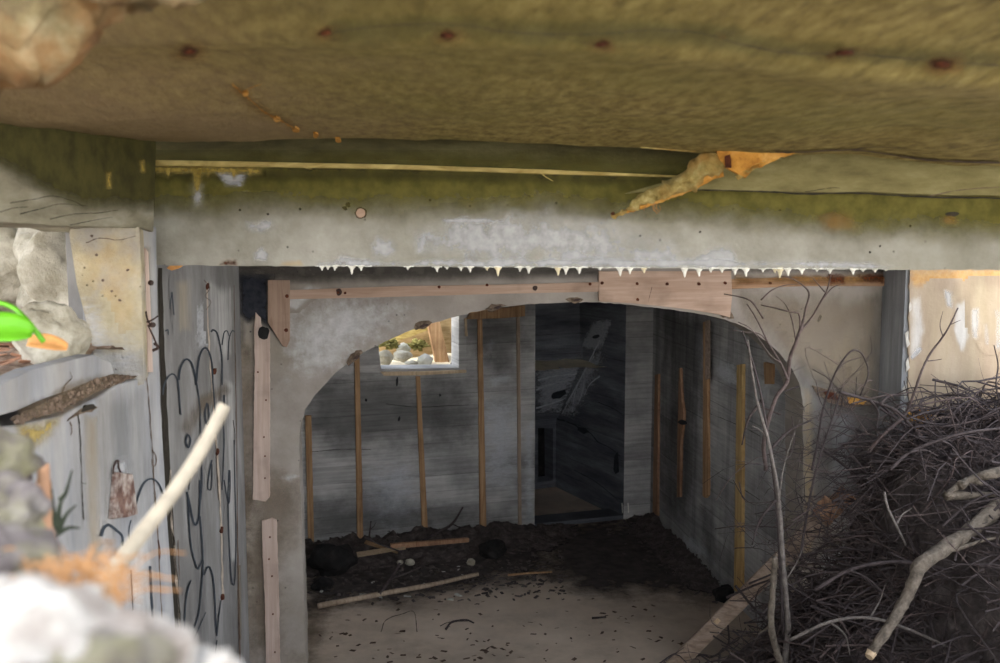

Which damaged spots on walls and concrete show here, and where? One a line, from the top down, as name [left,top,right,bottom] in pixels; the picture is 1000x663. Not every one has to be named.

spalling [716,151,794,180]
damp [169,219,884,582]
damp [909,276,1000,433]